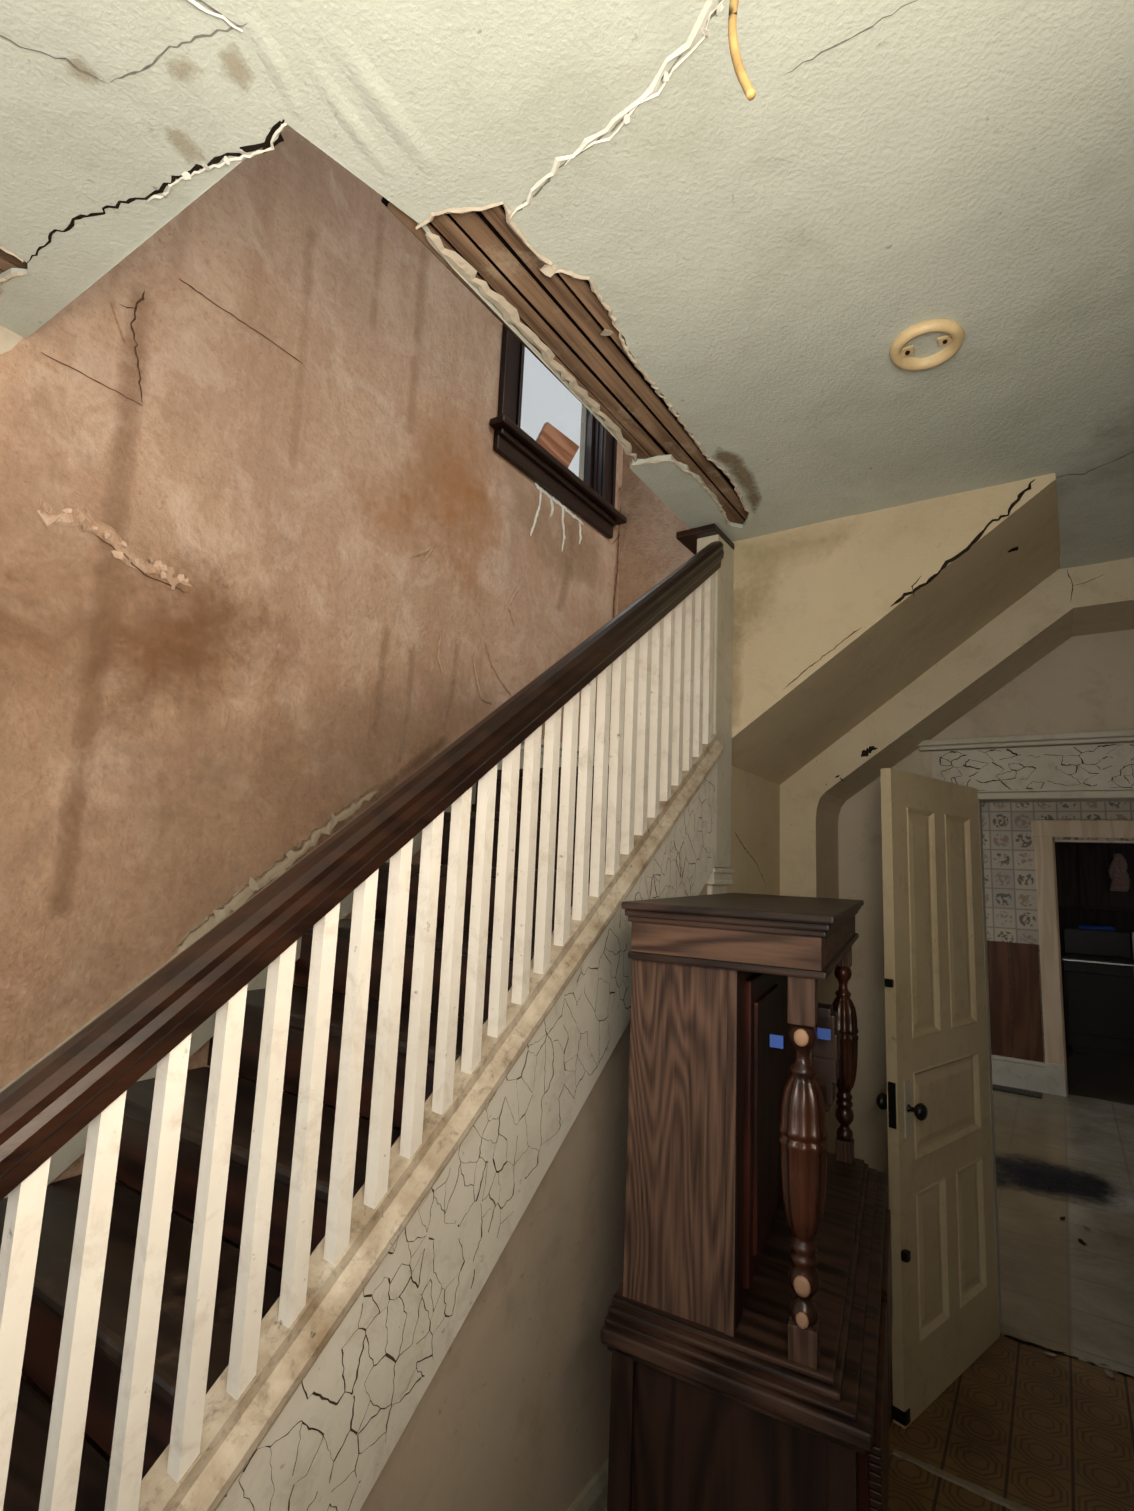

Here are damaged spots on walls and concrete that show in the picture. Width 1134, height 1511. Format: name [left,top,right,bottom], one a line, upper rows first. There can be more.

crack [0,0,247,83]
crack [510,0,724,218]
crack [783,0,917,75]
crack [27,119,287,263]
flaking render [0,245,29,295]
flaking render [416,202,750,514]
flaking render [632,459,731,526]
crack [783,451,1133,690]
damp [245,740,444,902]
crack [939,744,1134,791]
crack [225,780,764,1511]